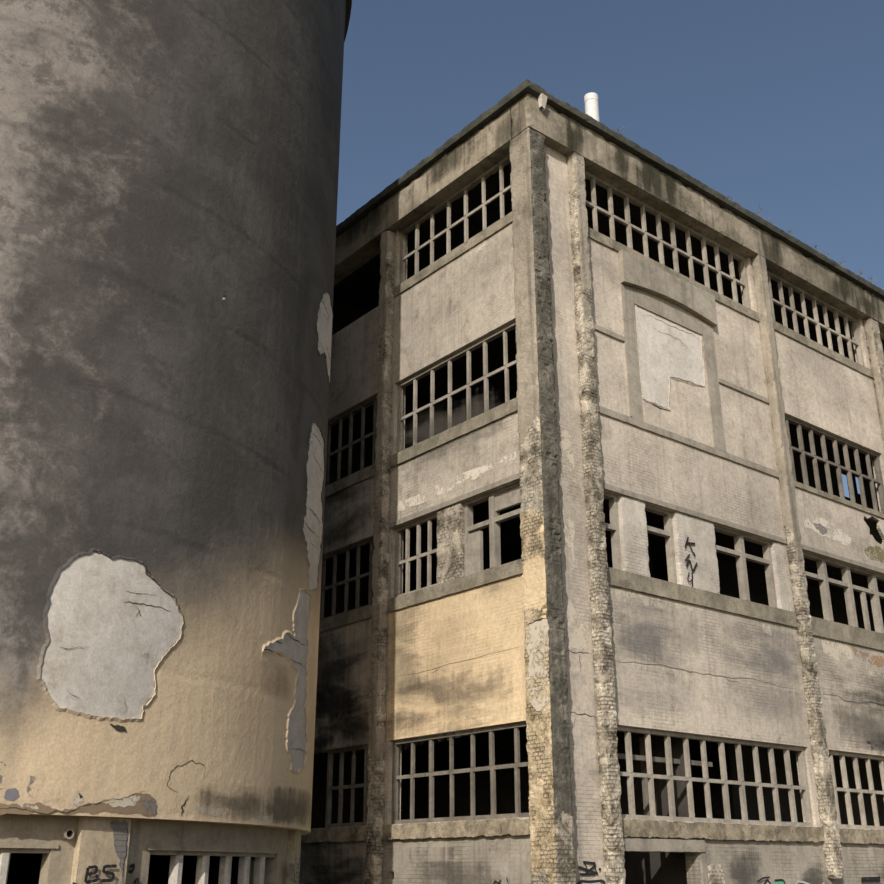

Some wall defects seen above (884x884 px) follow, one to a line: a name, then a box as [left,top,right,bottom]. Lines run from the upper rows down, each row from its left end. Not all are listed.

water stain [566,120,583,153]
water stain [615,143,675,201]
flaking render [315,291,334,392]
flaking render [634,302,705,411]
spalling [803,507,884,554]
flaking render [262,421,325,775]
flaking render [37,548,185,732]
crack [616,660,793,689]
water stain [314,690,365,753]
spalling [0,762,157,879]
crack [167,760,206,813]
water stain [206,787,310,821]